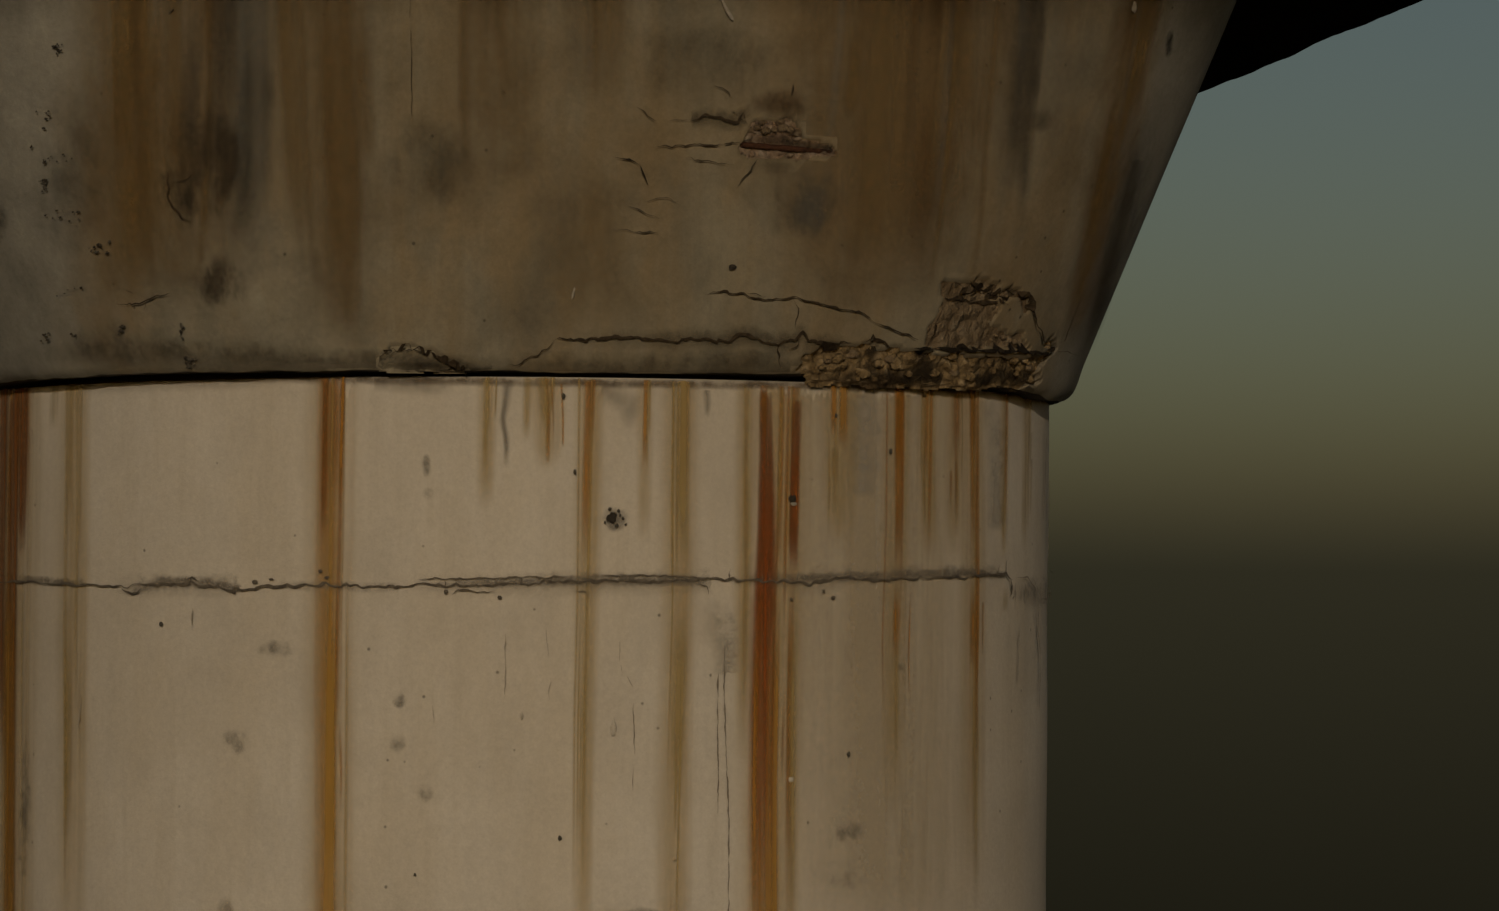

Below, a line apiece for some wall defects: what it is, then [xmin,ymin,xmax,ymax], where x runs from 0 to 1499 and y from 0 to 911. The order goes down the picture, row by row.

spalling [738,85,837,186]
rust [0,388,28,911]
rust [322,376,344,911]
crack [0,561,1053,624]
rust [579,379,595,653]
crack [510,290,918,367]
rust [753,387,799,911]
rust [896,388,904,491]
spalling [796,279,1055,392]
rust [955,390,979,753]